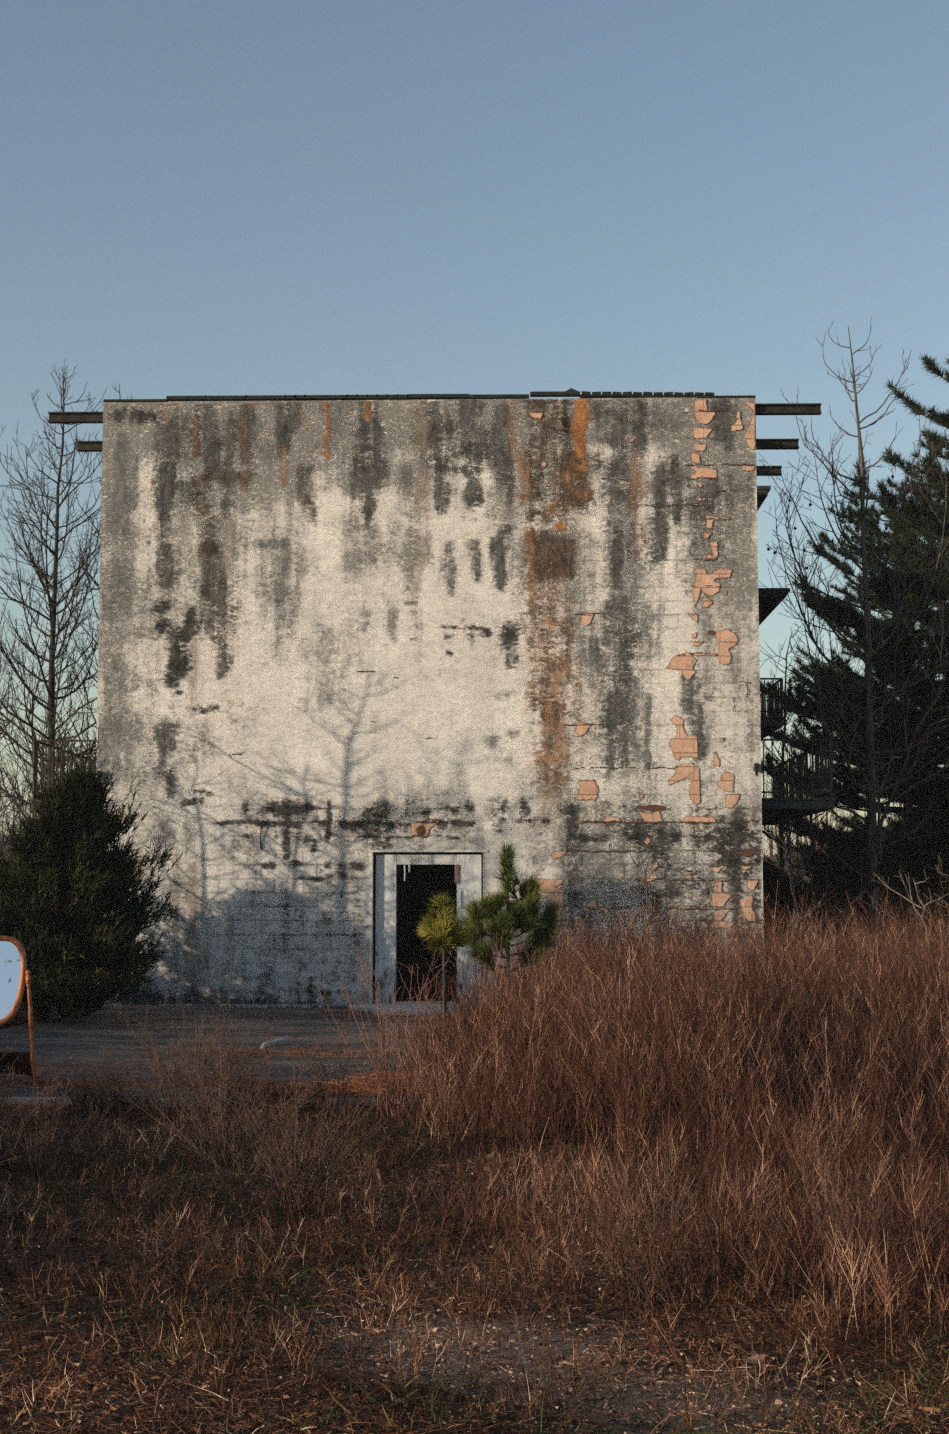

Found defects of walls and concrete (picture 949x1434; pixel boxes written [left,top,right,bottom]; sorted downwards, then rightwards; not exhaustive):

water stain [108,402,302,695]
water stain [297,466,319,520]
water stain [323,398,754,775]
corrosion [526,531,577,795]
corrosion [547,399,589,530]
peeling [666,399,738,680]
peeling [731,401,756,471]
water stain [97,661,242,845]
water stain [216,793,762,948]
peeling [534,878,564,935]
peeling [603,794,665,845]
peeling [628,850,759,946]